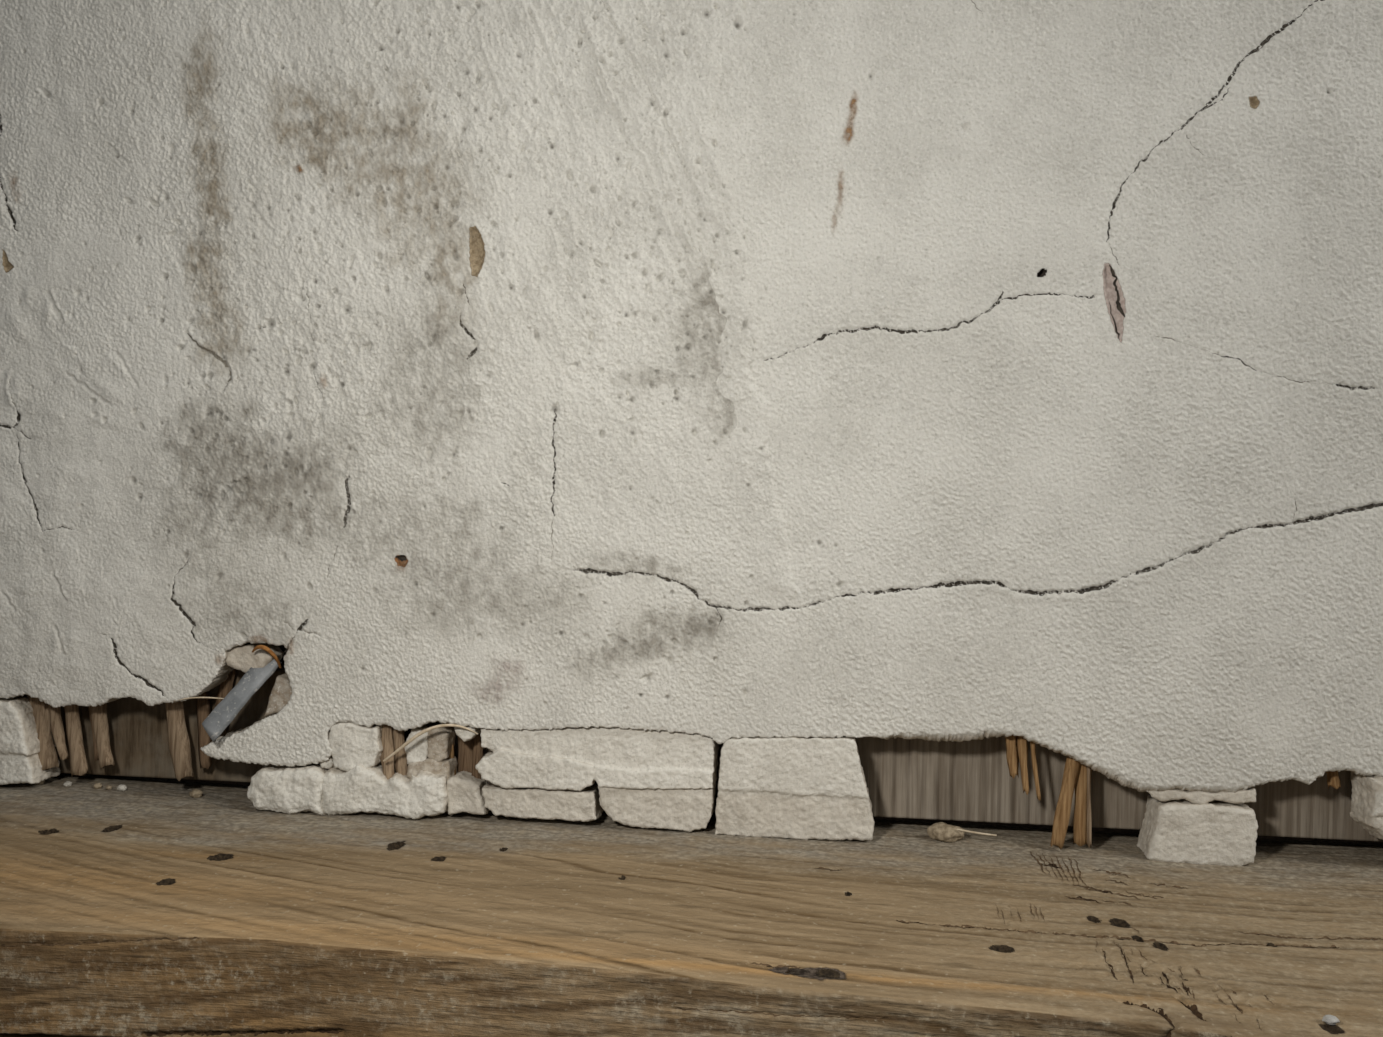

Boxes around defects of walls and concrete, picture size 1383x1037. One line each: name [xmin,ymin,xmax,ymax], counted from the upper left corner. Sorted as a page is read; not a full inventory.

crack [1106,0,1324,265]
crack [0,177,18,231]
crack [764,291,1094,361]
flaking render [1094,263,1126,342]
crack [1155,336,1375,390]
crack [550,408,1383,630]
crack [170,558,224,654]
crack [103,634,166,697]